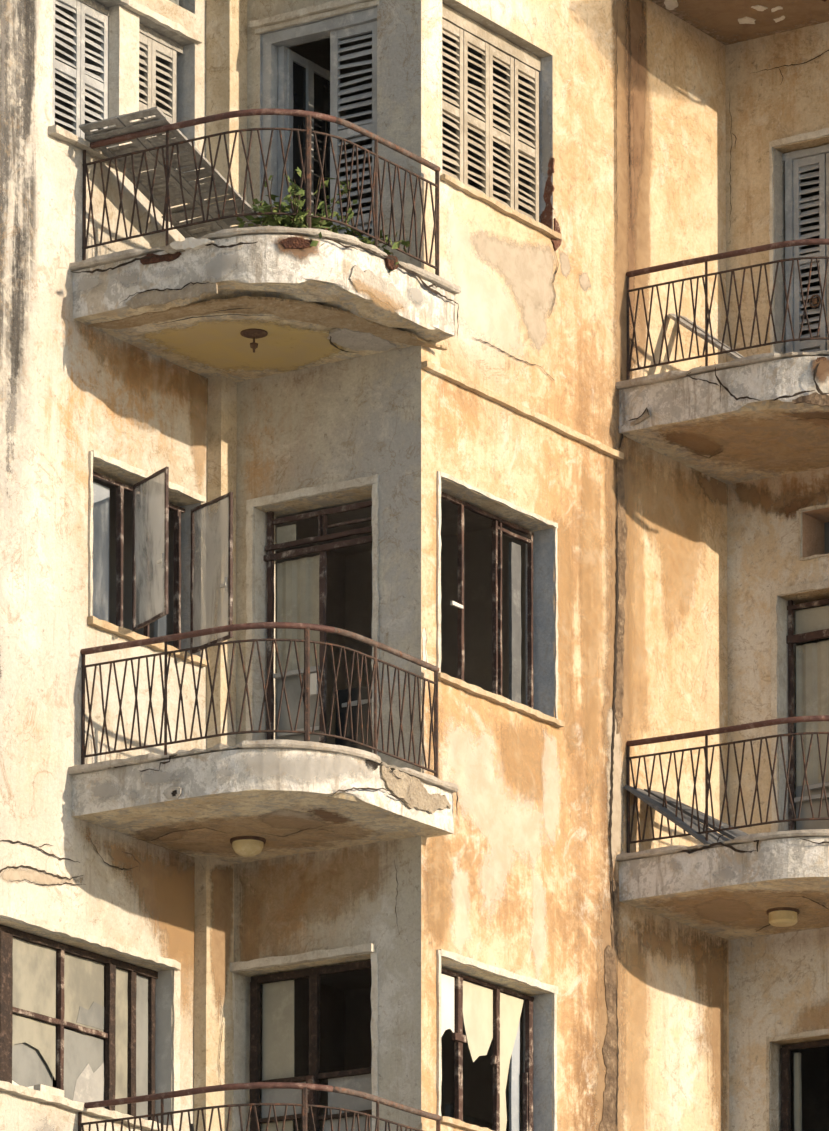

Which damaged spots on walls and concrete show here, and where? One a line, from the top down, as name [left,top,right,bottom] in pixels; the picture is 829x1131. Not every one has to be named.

water stain [0,0,36,199]
flaking render [540,101,562,251]
crack [71,256,157,273]
crack [205,240,258,248]
corrosion [277,235,320,259]
water stain [6,233,25,472]
crack [686,364,829,401]
peeling [784,392,829,427]
peeling [243,751,458,813]
flaking render [0,865,86,886]
water stain [86,827,195,970]
water stain [210,866,233,1020]